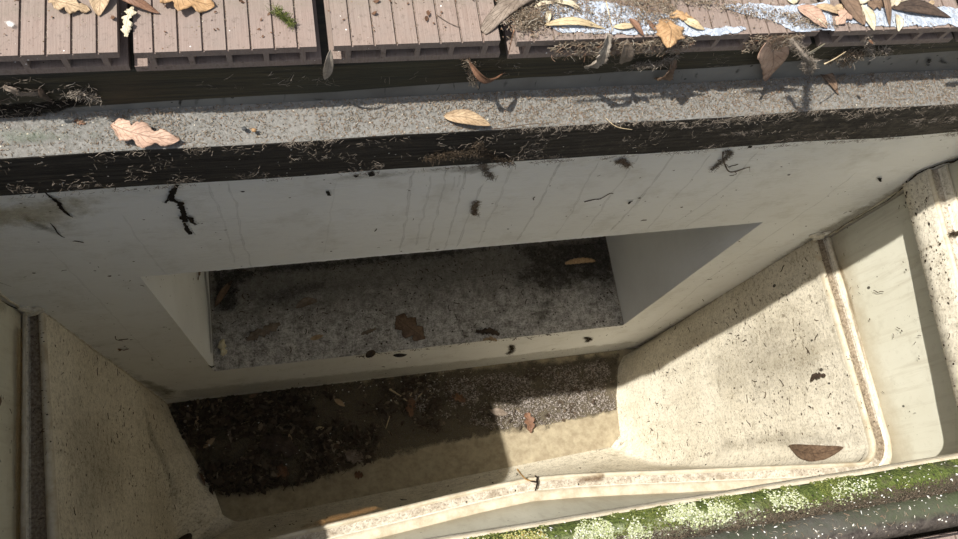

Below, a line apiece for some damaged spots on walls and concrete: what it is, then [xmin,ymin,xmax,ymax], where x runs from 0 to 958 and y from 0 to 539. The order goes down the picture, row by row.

crack [45,193,74,238]
crack [163,185,199,235]